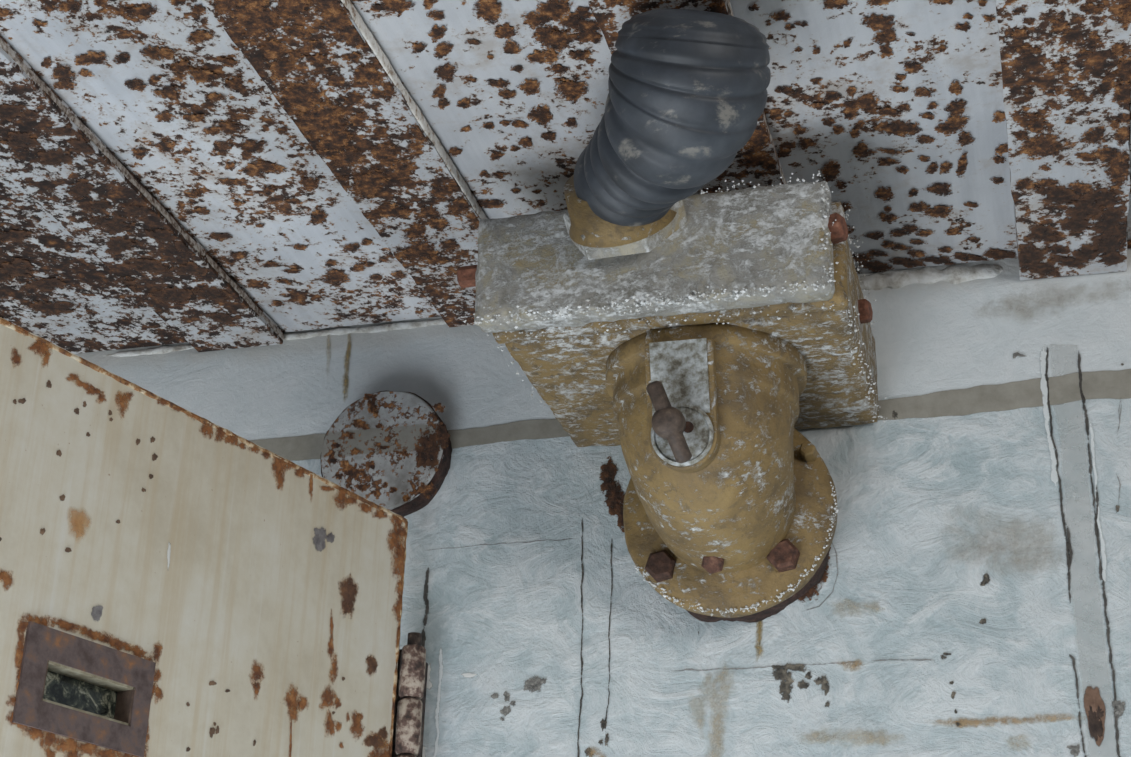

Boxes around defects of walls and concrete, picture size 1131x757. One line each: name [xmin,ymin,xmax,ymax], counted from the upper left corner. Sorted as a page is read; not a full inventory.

corrosion [3,320,51,367]
corrosion [0,258,82,317]
corrosion [0,104,95,168]
corrosion [62,179,243,324]
corrosion [41,0,602,287]
corrosion [463,0,1131,427]
corrosion [66,374,450,647]
crack [1040,347,1121,757]
corrosion [6,614,163,757]
crack [421,519,613,757]
crack [679,624,931,671]
corrosion [1084,686,1106,746]